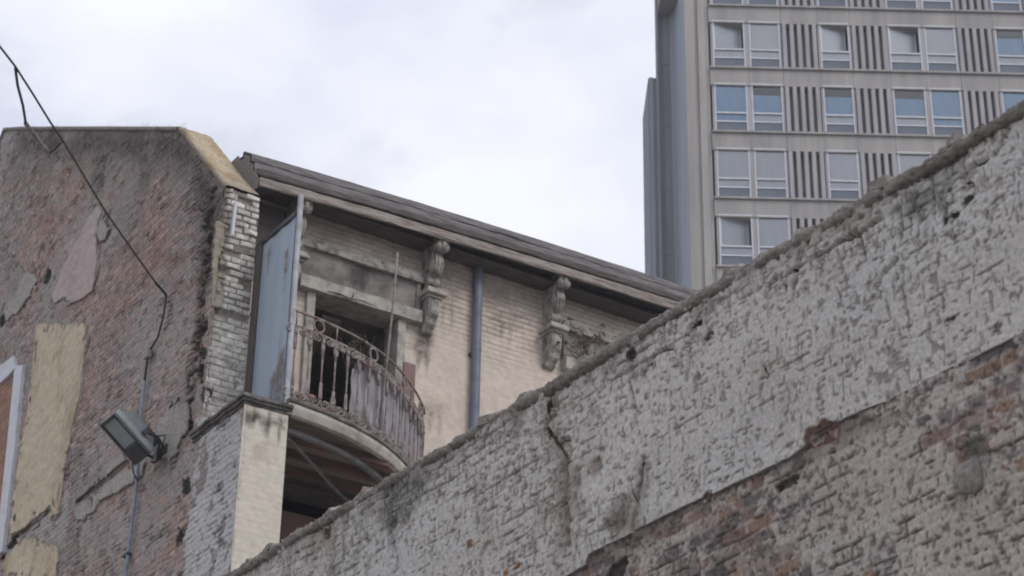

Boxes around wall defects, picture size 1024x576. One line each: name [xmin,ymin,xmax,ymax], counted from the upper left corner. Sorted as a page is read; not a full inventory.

flaking render [2,204,106,576]
spalling [182,475,191,498]
spalling [192,321,215,397]
crack [547,399,572,545]
flaking render [571,330,1024,576]